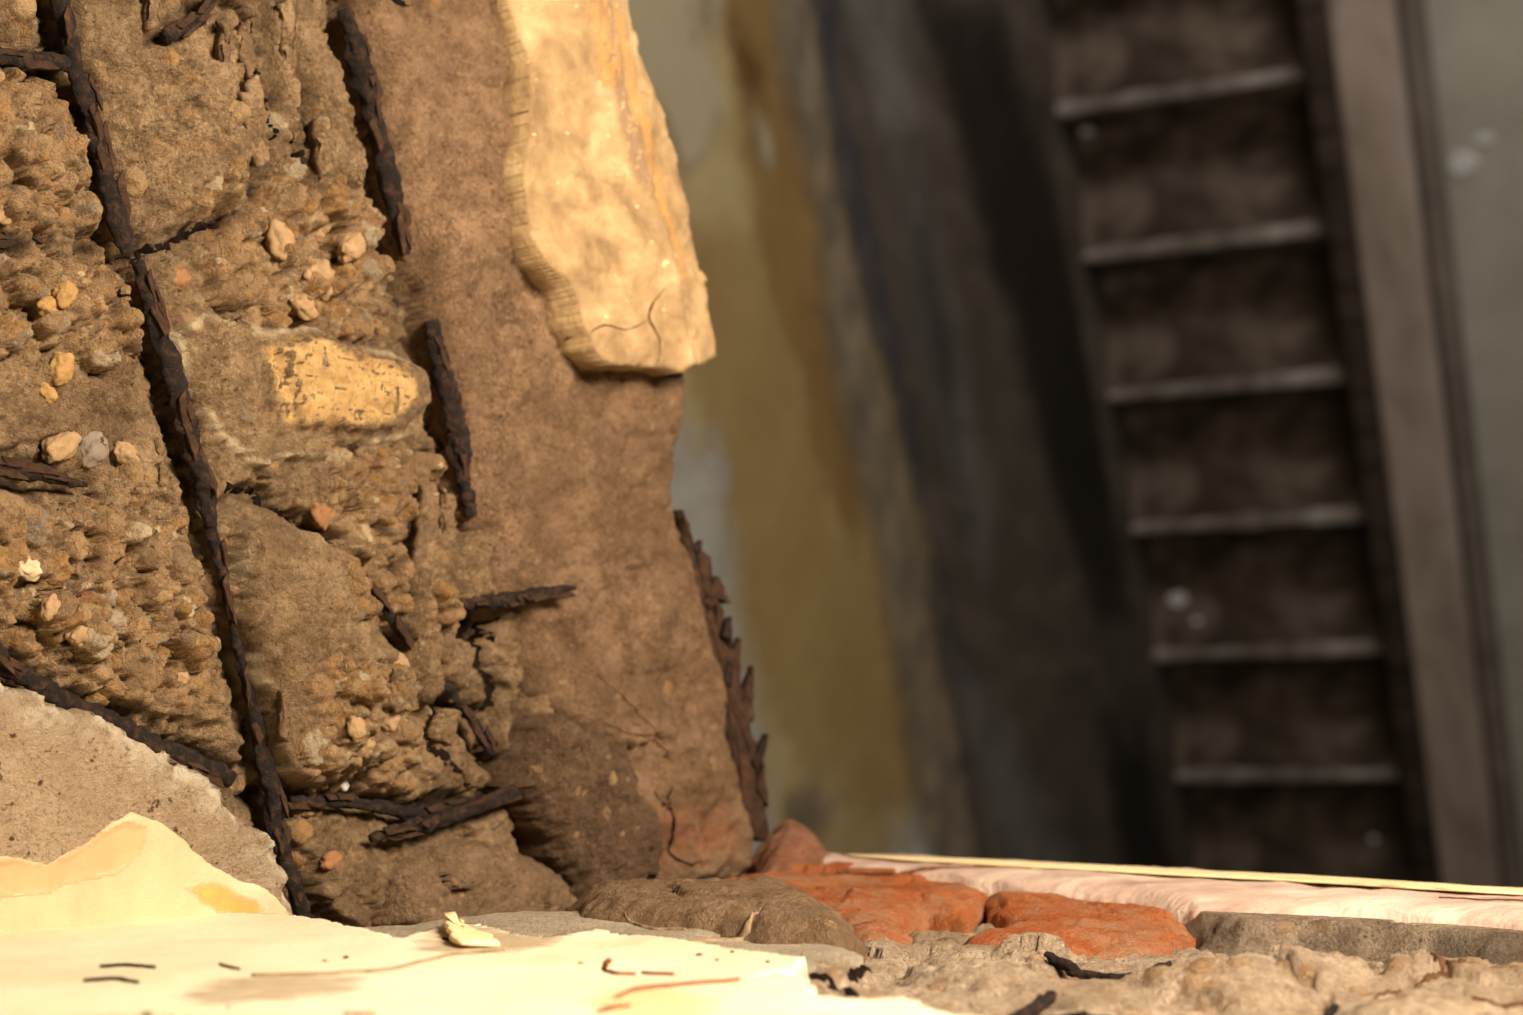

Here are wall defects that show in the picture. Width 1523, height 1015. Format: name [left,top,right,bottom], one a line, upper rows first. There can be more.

corrosion [0,48,60,70]
corrosion [63,6,75,47]
corrosion [161,0,216,38]
corrosion [88,74,131,219]
leakage [937,10,1122,615]
spalling [0,0,554,833]
spalling [283,0,772,947]
leakage [699,0,1068,863]
peeling [0,812,295,934]
corrosion [186,762,225,788]
spalling [701,812,1523,1015]
leakage [1112,743,1166,868]